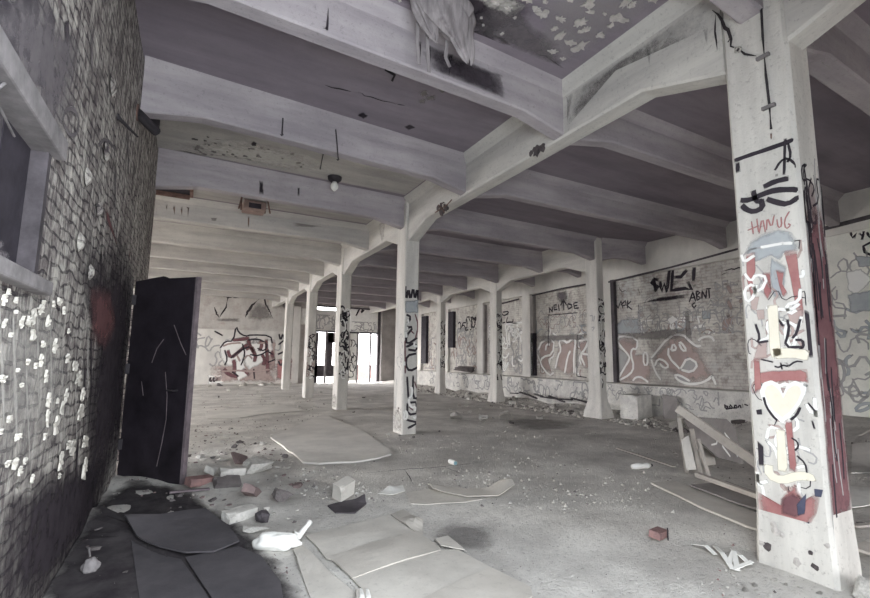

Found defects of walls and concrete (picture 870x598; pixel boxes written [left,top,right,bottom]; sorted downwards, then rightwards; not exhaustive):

damp [485,11,556,63]
peeling [484,0,636,61]
crack [712,10,756,56]
peeling [192,136,305,168]
peeling [0,288,86,440]
peeling [5,457,35,483]
peeling [58,435,89,480]